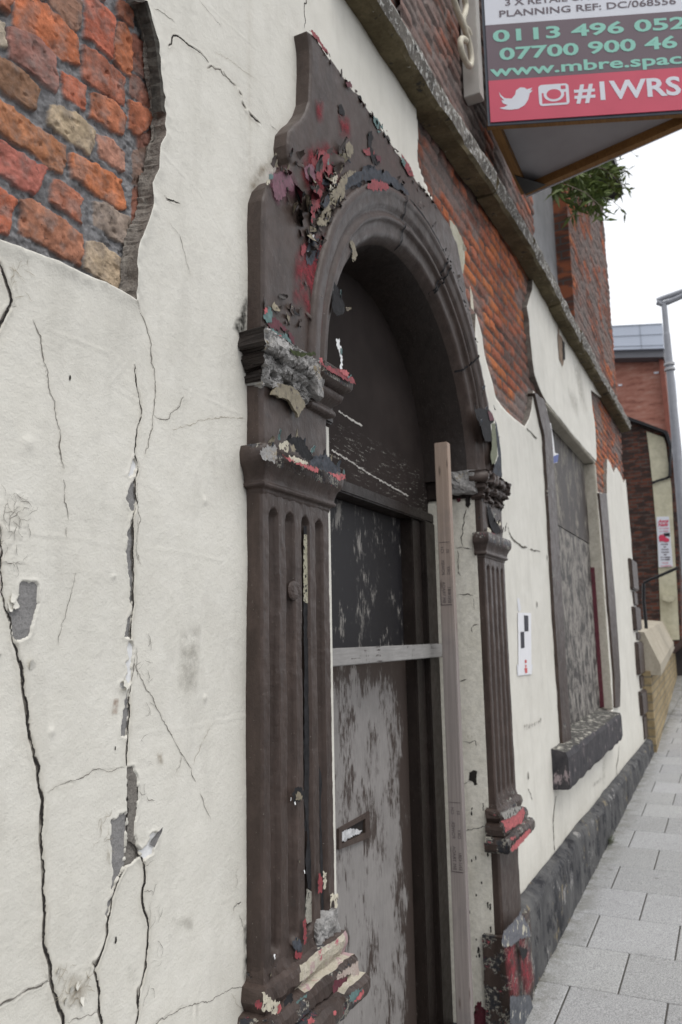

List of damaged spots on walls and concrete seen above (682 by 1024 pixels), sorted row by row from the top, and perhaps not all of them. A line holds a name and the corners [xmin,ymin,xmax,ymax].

crack [156,9,278,132]
flaking render [0,0,165,301]
flaking render [238,0,537,535]
flaking render [566,183,618,399]
crack [0,265,69,536]
flaking render [591,393,624,493]
peeling [0,488,37,641]
crack [0,311,242,1024]
peeling [93,766,163,917]
peeling [255,992,307,1014]
spalling [292,871,341,959]
peeling [490,912,533,1024]